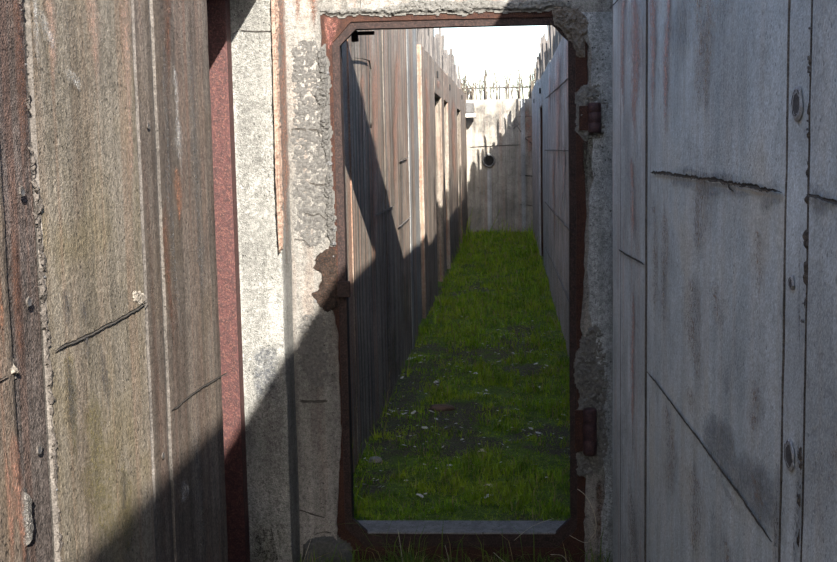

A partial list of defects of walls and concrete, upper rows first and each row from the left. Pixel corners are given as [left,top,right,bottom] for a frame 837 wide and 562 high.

spalling [320,0,589,57]
spalling [311,44,339,312]
crack [650,171,782,193]
crack [806,194,837,204]
spalling [573,324,609,478]